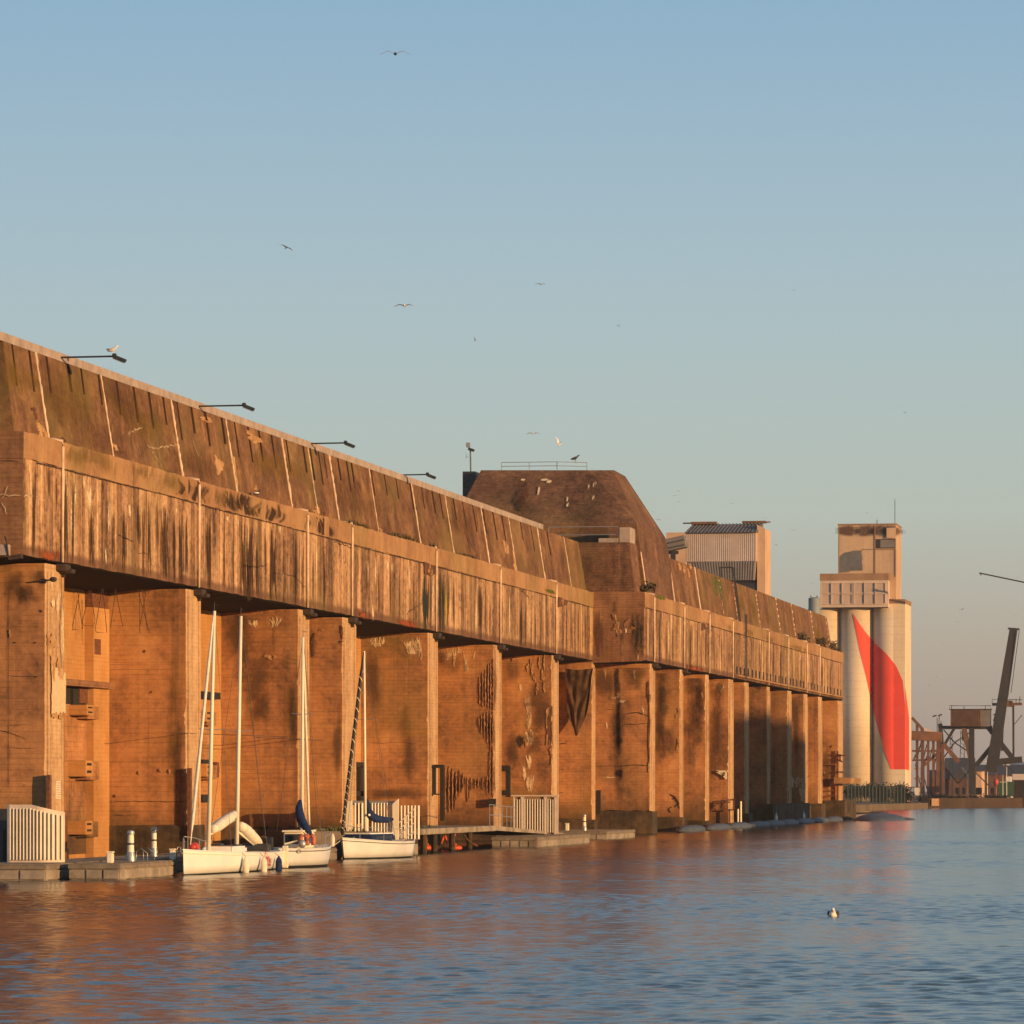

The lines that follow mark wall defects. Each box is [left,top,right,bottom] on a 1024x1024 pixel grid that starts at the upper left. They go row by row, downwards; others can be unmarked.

damp [30,464,188,582]
damp [180,479,208,502]
spalling [214,455,238,487]
damp [206,492,333,605]
crack [0,460,590,607]
damp [50,572,64,655]
damp [366,559,456,660]
damp [475,589,491,639]
damp [509,599,536,647]
spalling [519,654,554,792]
damp [566,602,673,751]
damp [685,625,724,764]